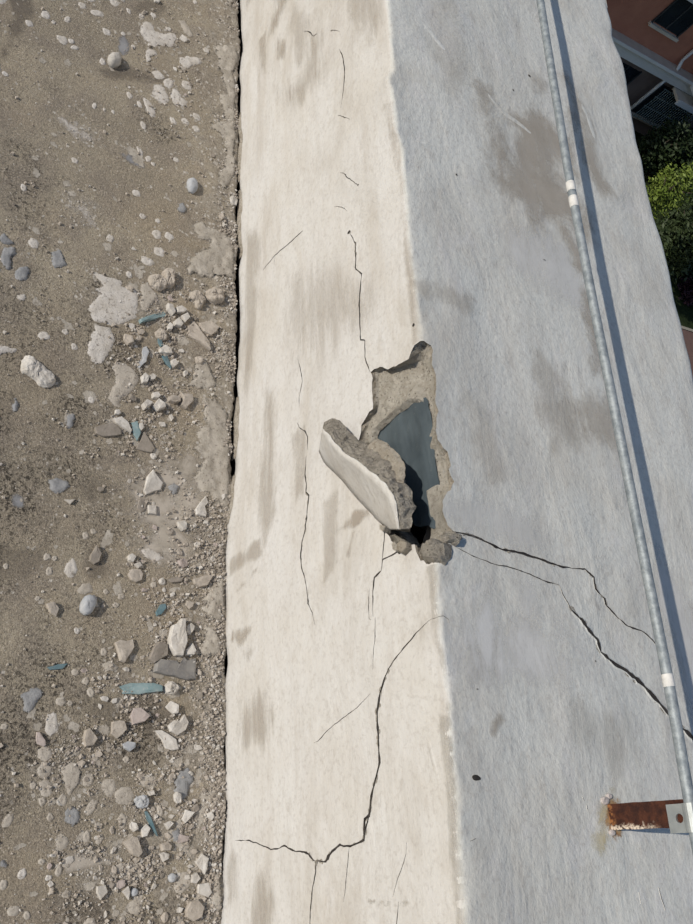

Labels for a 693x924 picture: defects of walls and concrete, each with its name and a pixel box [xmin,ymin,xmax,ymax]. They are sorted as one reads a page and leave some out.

crack [304,30,349,119]
crack [350,234,370,371]
crack [297,360,315,624]
spalling [359,341,454,564]
crack [236,532,449,924]
crack [455,531,693,743]